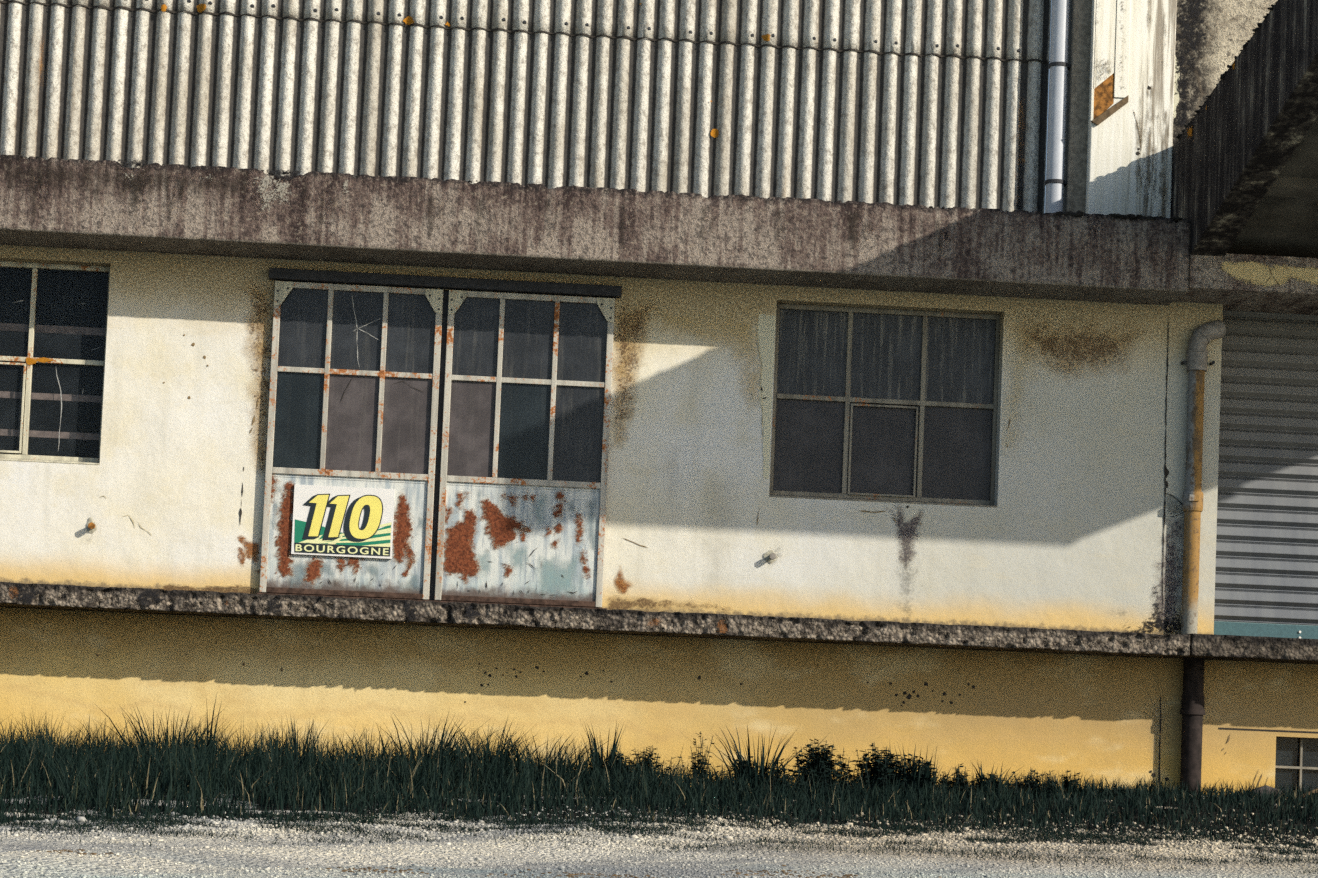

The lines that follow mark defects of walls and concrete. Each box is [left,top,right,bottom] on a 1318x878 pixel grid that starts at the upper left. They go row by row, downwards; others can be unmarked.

damp [1136,0,1209,217]
rust [248,287,363,585]
rust [238,536,260,573]
rust [392,495,415,577]
rust [443,490,592,583]
damp [897,511,921,566]
damp [1126,521,1182,634]